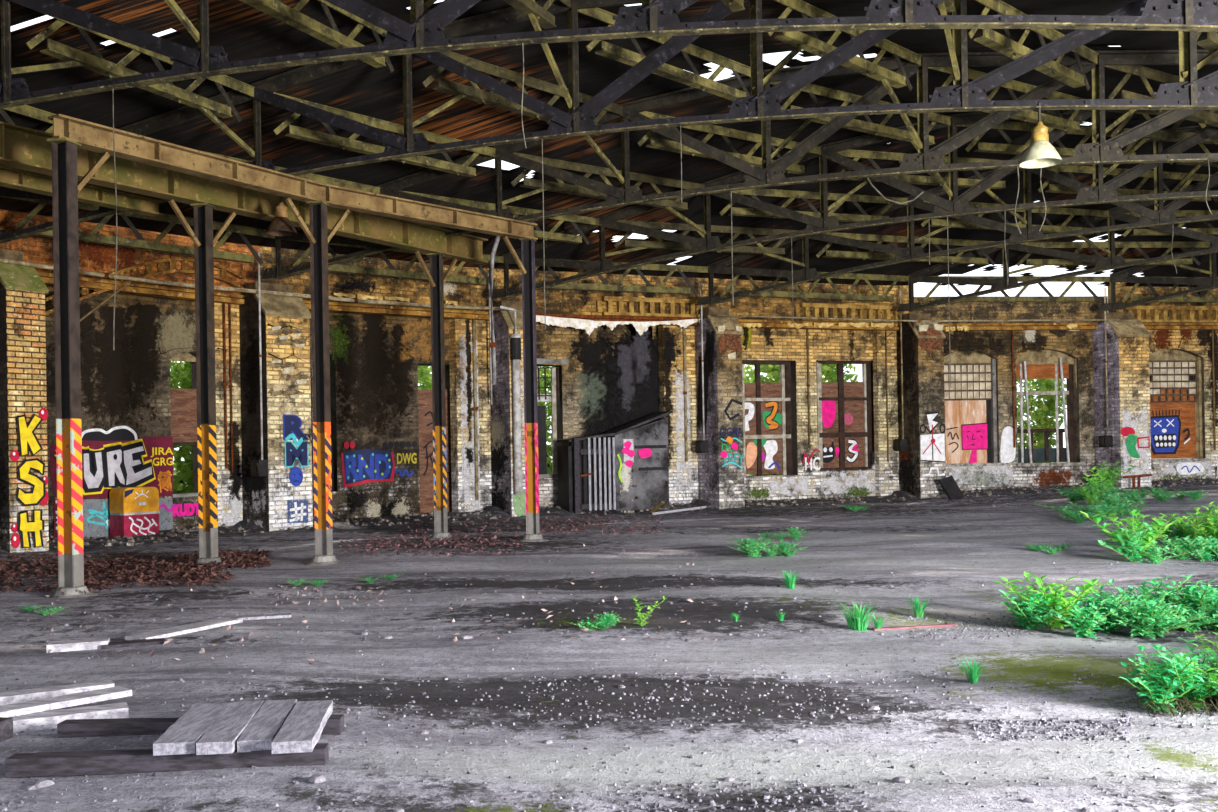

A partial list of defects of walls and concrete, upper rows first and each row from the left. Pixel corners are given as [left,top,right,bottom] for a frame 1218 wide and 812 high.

leakage [80,302,163,431]
leakage [333,313,413,437]
peeling [401,319,481,512]
peeling [536,315,701,336]